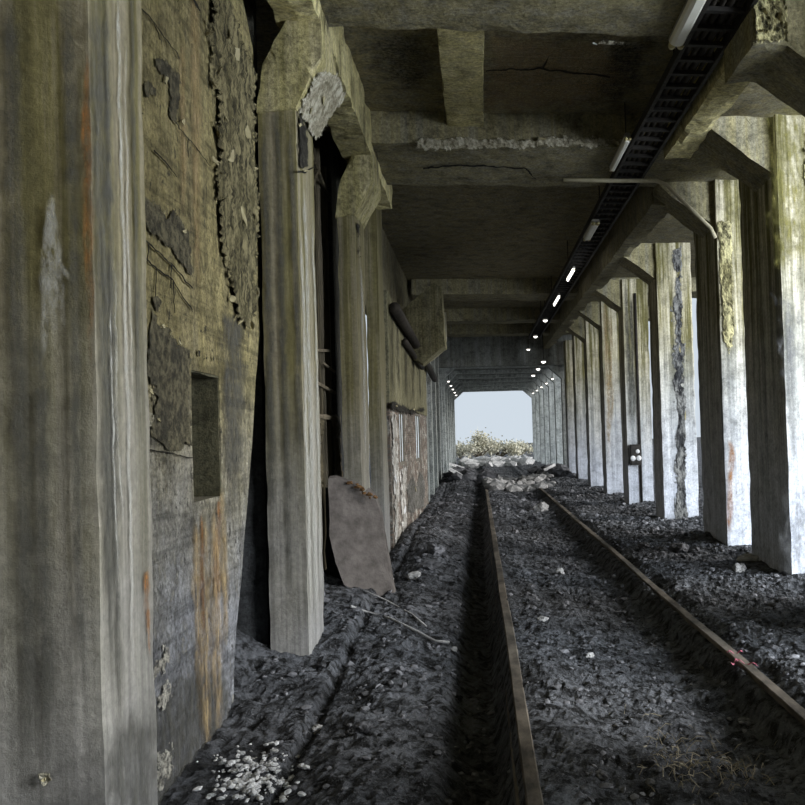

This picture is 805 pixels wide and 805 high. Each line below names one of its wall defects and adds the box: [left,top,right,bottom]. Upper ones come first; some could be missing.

peeling [155,58,185,125]
spalling [298,71,346,172]
crack [423,164,536,179]
crack [486,59,610,78]
peeling [145,195,194,279]
crack [146,240,193,311]
water stain [90,15,139,676]
peeling [147,296,193,452]
spalling [670,246,688,519]
crack [150,449,193,458]
rust [194,497,227,731]
water stain [108,644,228,805]